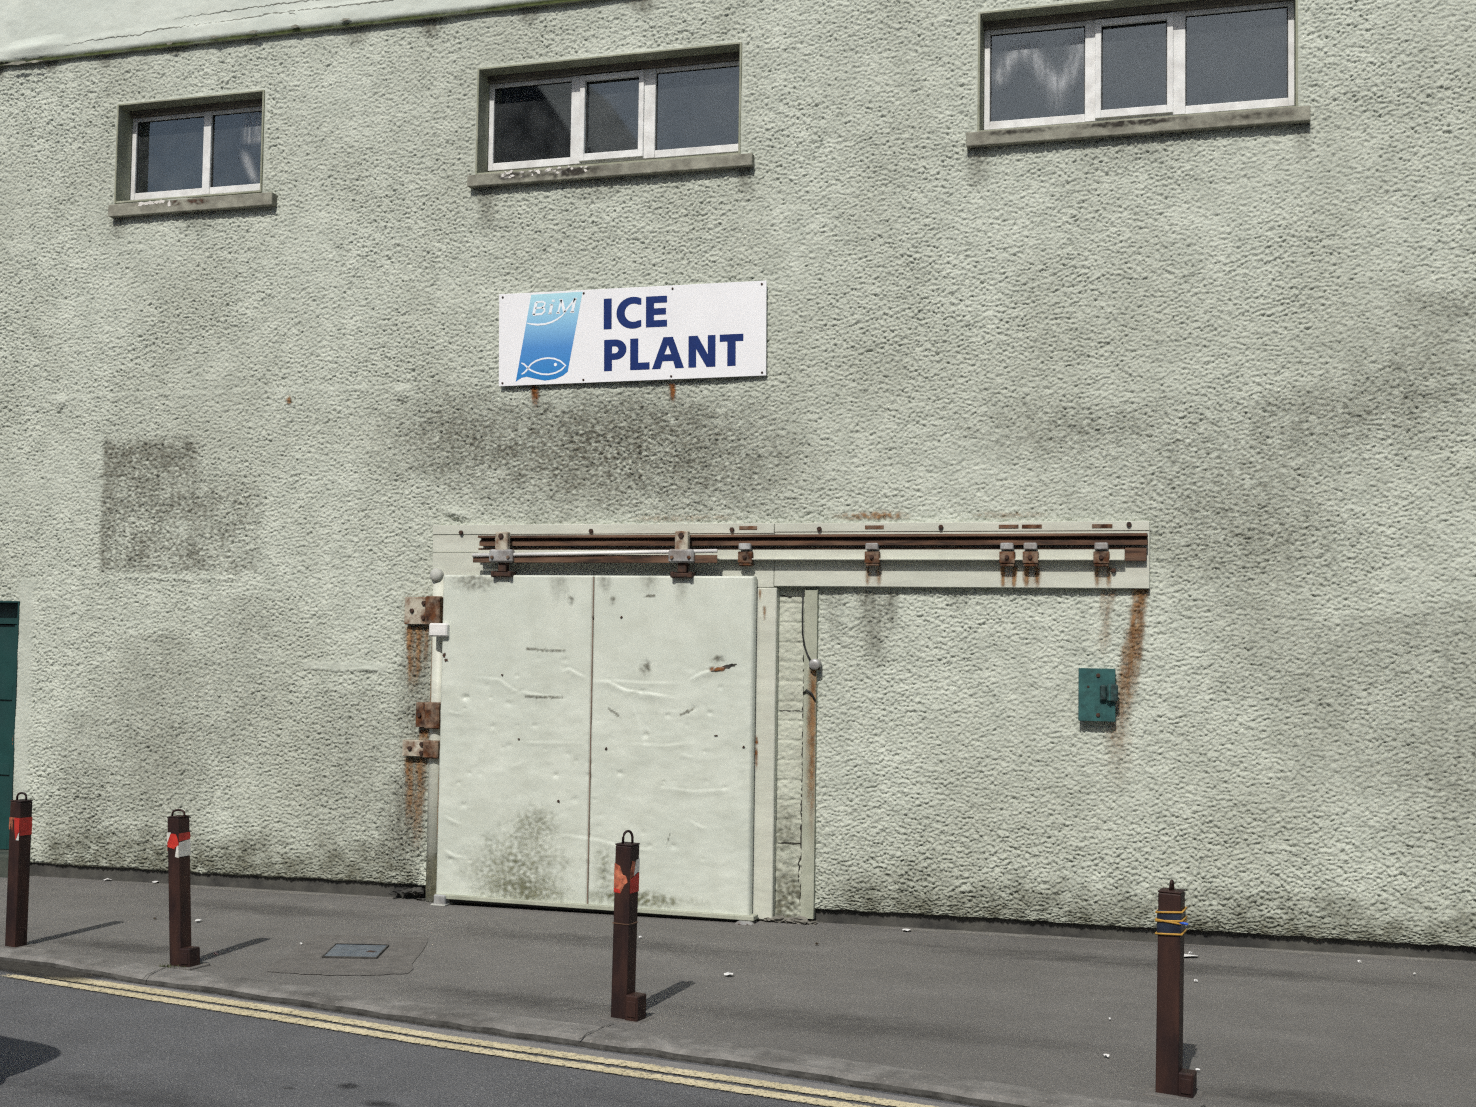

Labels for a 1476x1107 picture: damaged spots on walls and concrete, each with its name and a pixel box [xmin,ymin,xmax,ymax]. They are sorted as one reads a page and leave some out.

damp [102,442,206,567]
rust [406,626,432,702]
rust [1119,589,1147,716]
rust [405,757,439,817]